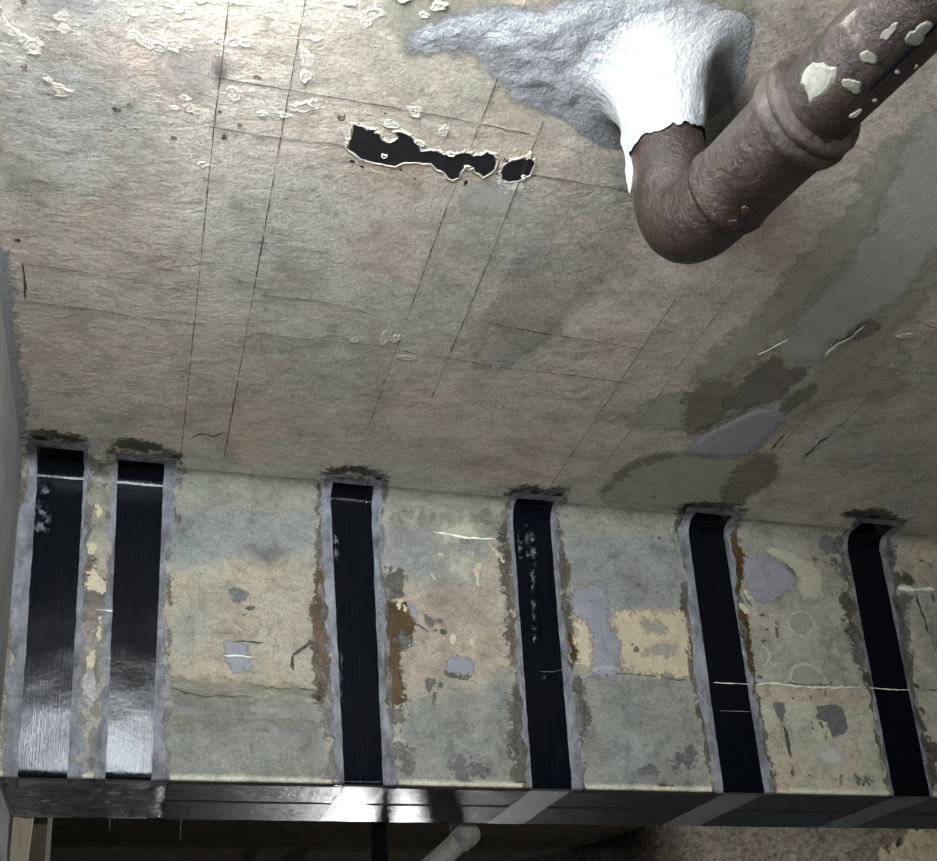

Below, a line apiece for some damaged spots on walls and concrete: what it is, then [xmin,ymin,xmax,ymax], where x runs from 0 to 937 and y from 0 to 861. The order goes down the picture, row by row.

peeling [337,111,538,215]
damp [625,135,937,434]
damp [600,452,779,541]
rust [77,555,106,735]
rust [308,499,334,753]
rust [383,566,417,777]
peeling [572,618,595,674]
peeling [611,607,692,681]
damp [679,582,690,621]
damp [693,675,705,728]
crack [756,681,861,689]
peeling [877,829,937,861]